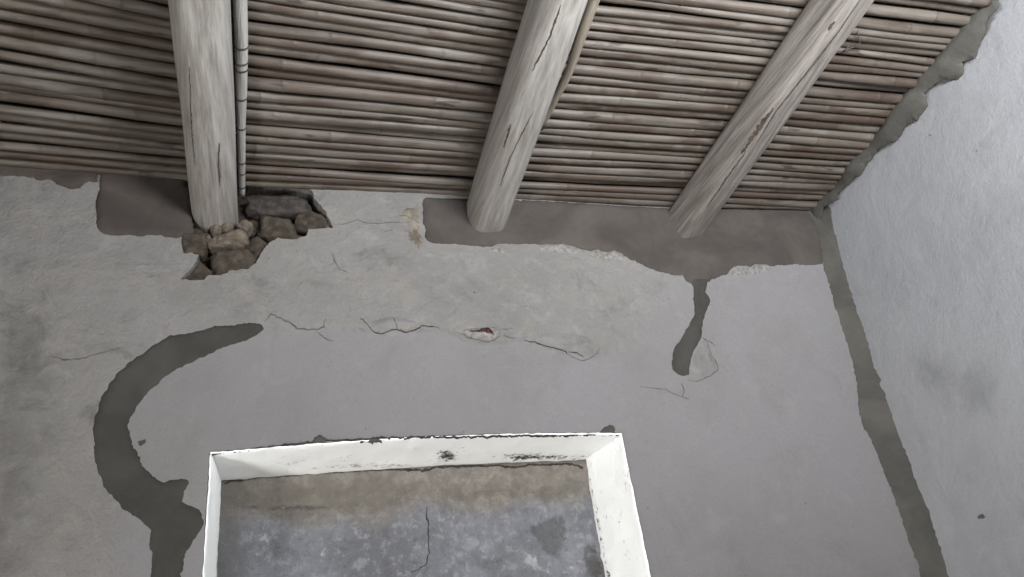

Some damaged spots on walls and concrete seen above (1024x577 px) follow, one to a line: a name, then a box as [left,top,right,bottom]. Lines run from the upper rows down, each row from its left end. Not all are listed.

flaking render [181,193,332,280]
crack [264,313,333,342]
crack [360,318,600,361]